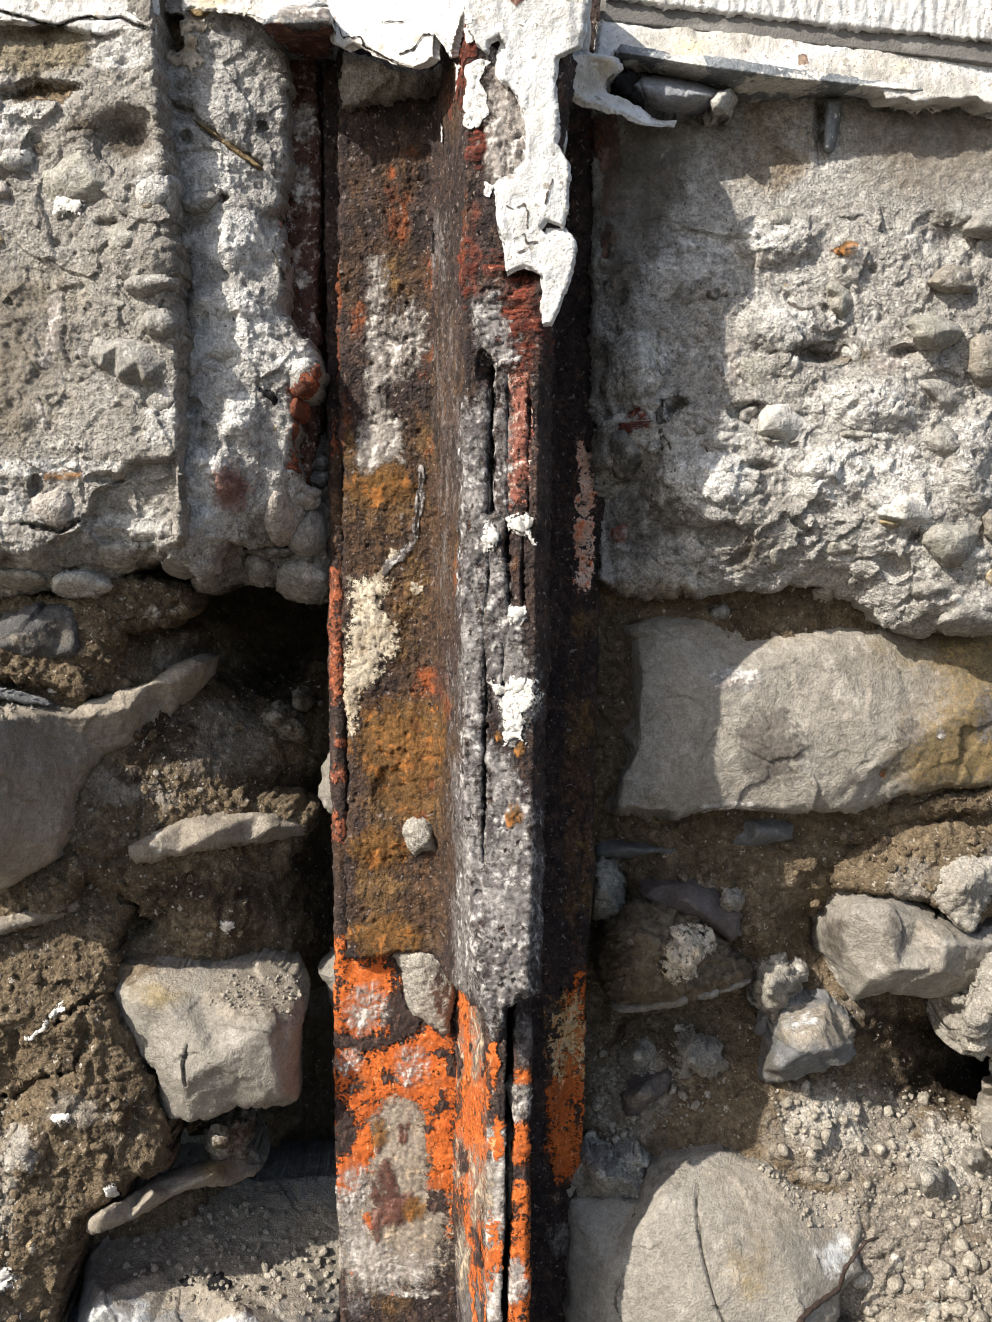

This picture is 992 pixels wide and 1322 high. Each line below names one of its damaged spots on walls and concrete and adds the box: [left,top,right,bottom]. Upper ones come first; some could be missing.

rust [456,25,476,109]
peeling [455,47,527,197]
peeling [572,50,677,128]
rust [457,237,555,512]
rust [343,465,418,508]
leakage [410,581,423,595]
crack [485,526,512,627]
leakage [342,548,401,737]
rust [346,693,447,870]
rust [347,911,424,960]
rust [333,980,493,1243]
rust [468,1227,483,1270]